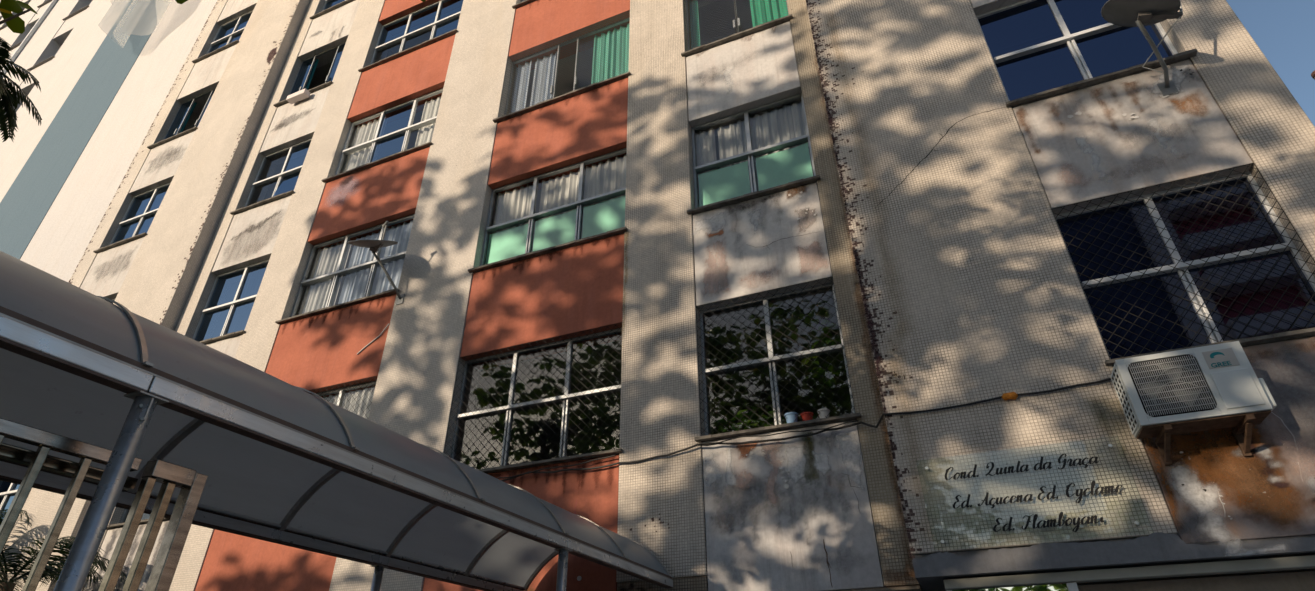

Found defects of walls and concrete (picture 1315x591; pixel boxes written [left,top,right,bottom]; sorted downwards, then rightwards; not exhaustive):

crack [877,107,1005,206]
spalling [787,185,817,231]
peeling [806,0,925,558]
water stain [1258,345,1315,477]
peeling [705,433,863,504]
water stain [801,432,832,490]
corrosion [1142,425,1301,531]